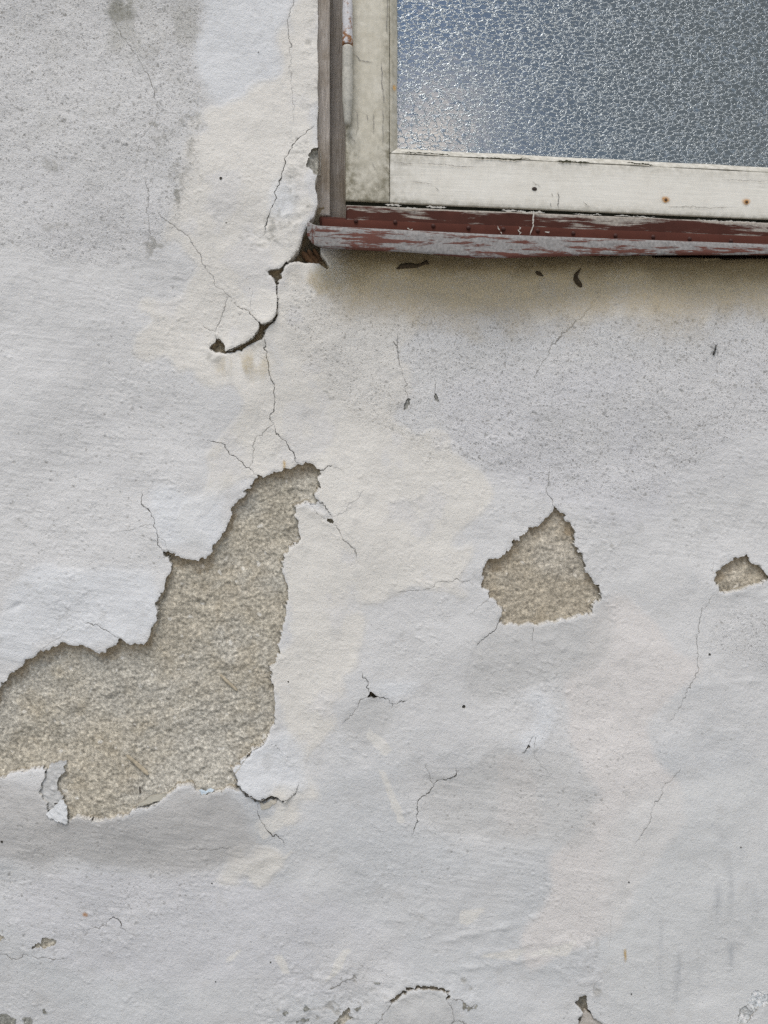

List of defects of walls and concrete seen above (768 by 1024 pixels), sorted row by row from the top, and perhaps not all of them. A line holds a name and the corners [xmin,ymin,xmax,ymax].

crack [145,182,340,475]
crack [124,494,171,552]
crack [317,493,361,555]
spalling [481,506,602,627]
spalling [714,554,768,594]
spalling [0,462,333,825]